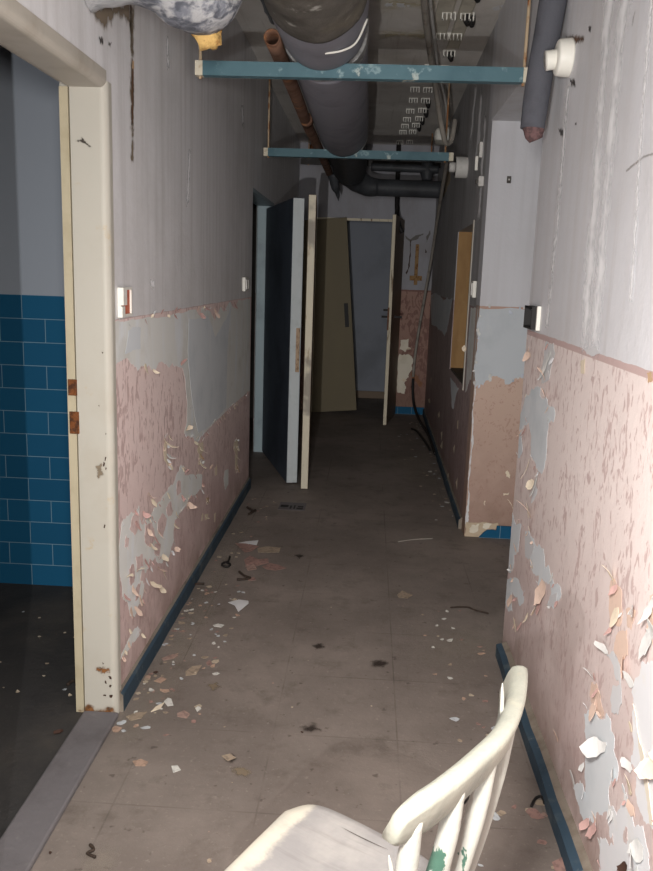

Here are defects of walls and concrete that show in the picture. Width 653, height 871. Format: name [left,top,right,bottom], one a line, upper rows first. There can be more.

peeling [115,299,250,662]
peeling [397,339,413,394]
peeling [450,304,530,537]
peeling [503,341,561,632]
corrosion [85,662,114,712]
peeling [569,565,653,871]
peeling [552,857,566,871]